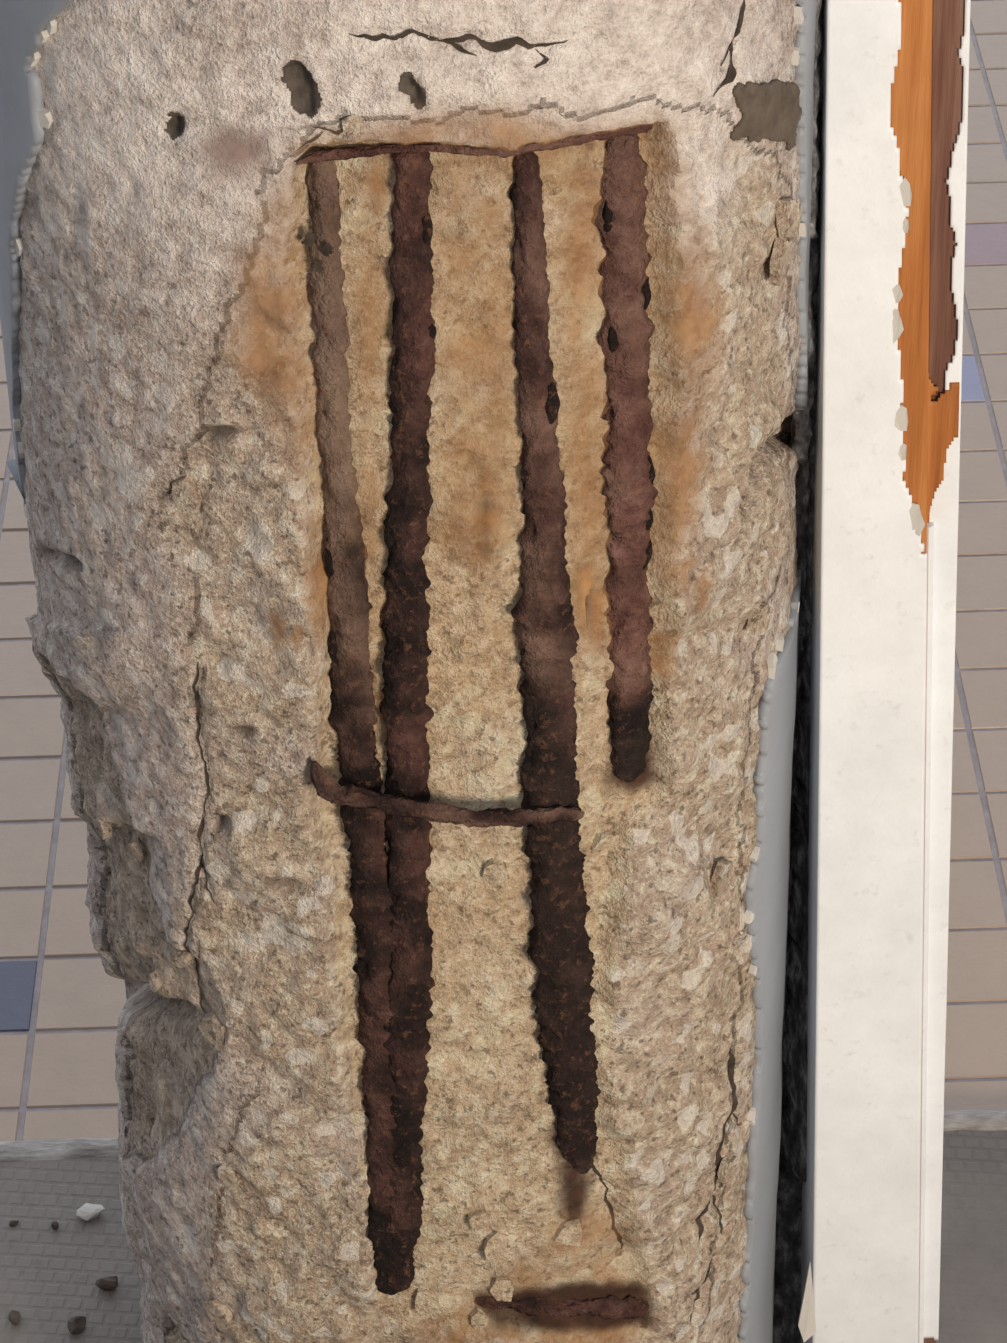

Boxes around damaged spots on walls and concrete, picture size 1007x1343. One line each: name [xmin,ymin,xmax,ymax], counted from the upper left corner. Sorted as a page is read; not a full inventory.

crack [349,29,568,69]
spalling [49,0,818,1343]
rust [612,751,655,789]
crack [184,662,215,1012]
rust [554,1127,589,1221]
crack [592,1164,624,1249]
crack [690,1048,741,1322]
rust [481,1284,653,1339]